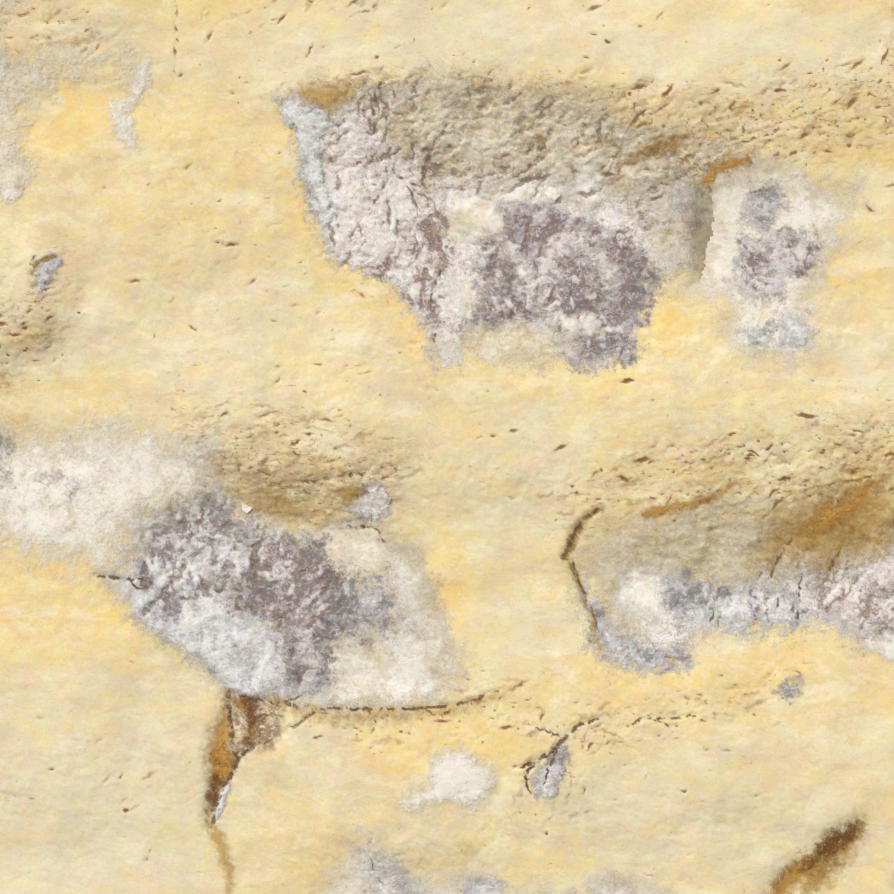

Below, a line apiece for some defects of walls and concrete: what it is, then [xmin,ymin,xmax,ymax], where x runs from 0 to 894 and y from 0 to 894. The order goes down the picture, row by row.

leakage [0,419,220,580]
crack [572,561,599,631]
rust [204,690,455,894]
crack [211,689,504,826]
crack [520,714,696,793]
rust [772,820,866,894]